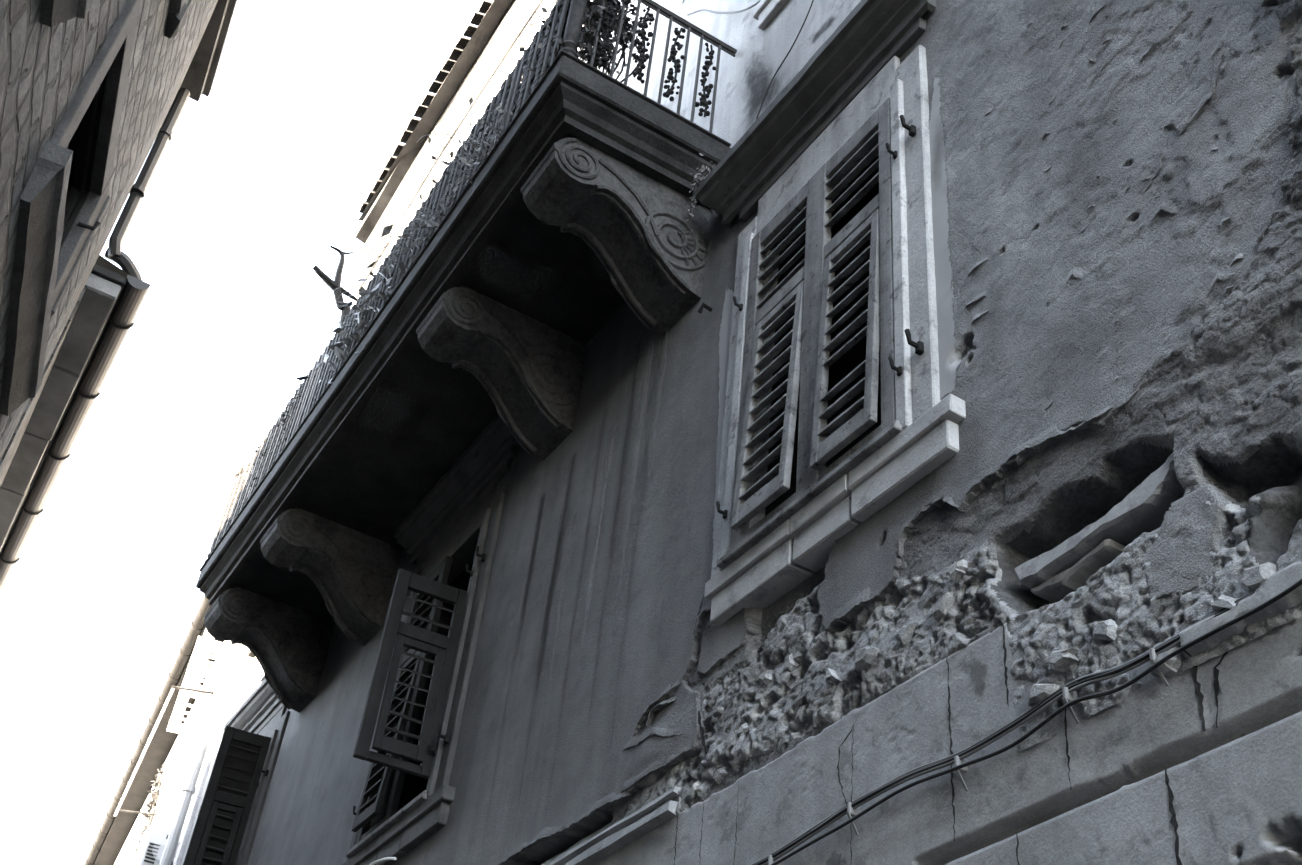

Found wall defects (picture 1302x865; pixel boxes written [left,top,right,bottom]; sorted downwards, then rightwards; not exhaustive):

spalling [496,0,1302,865]